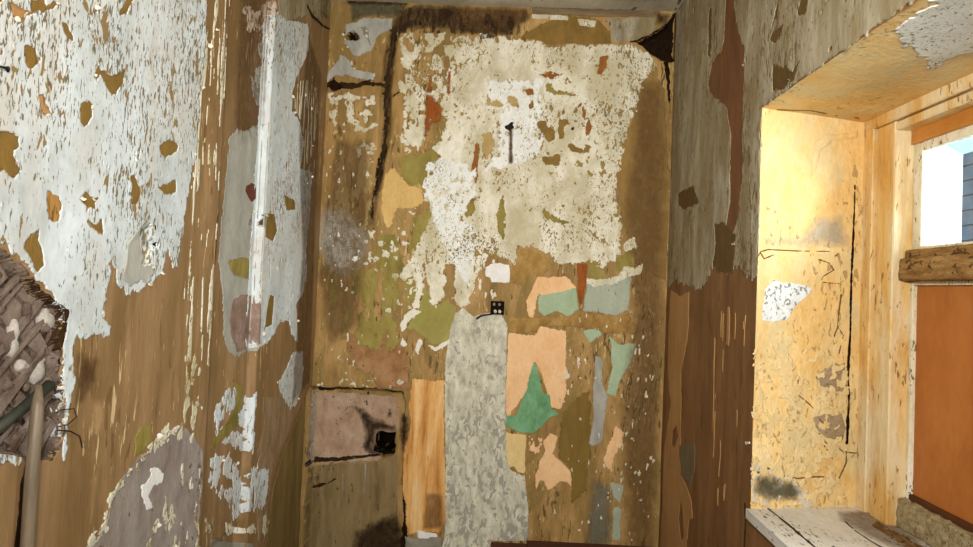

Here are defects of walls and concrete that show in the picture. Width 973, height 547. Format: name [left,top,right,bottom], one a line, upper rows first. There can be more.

crack [327,27,400,229]
leakage [453,7,528,32]
peeling [894,0,973,70]
peeling [0,0,331,547]
peeling [208,0,915,547]
crack [756,185,857,479]
leakage [756,477,797,498]
peeling [872,521,923,547]